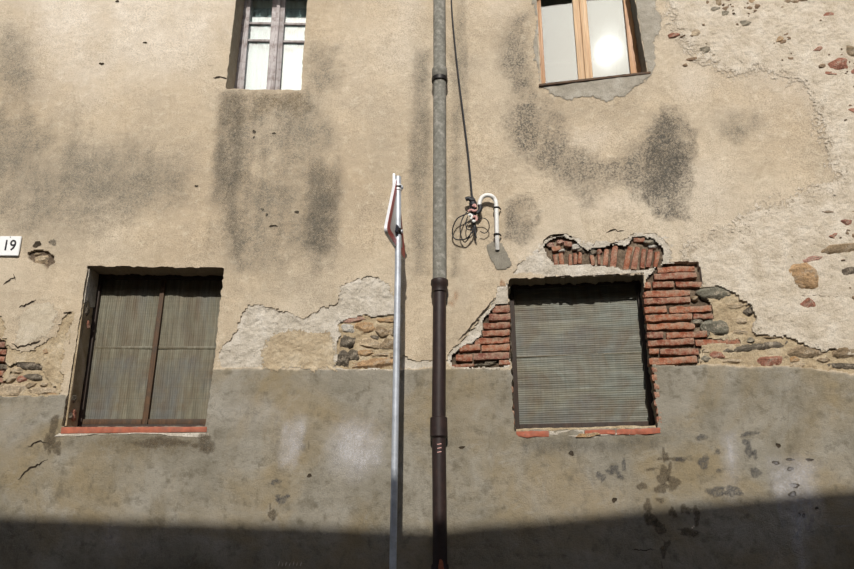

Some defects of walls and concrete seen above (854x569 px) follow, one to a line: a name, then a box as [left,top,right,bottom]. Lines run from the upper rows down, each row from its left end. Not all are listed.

leakage [512,103,691,219]
spalling [514,0,854,374]
spalling [29,251,55,268]
peeling [0,302,75,397]
peeling [218,276,432,373]
spalling [447,284,511,370]
crack [18,440,46,480]